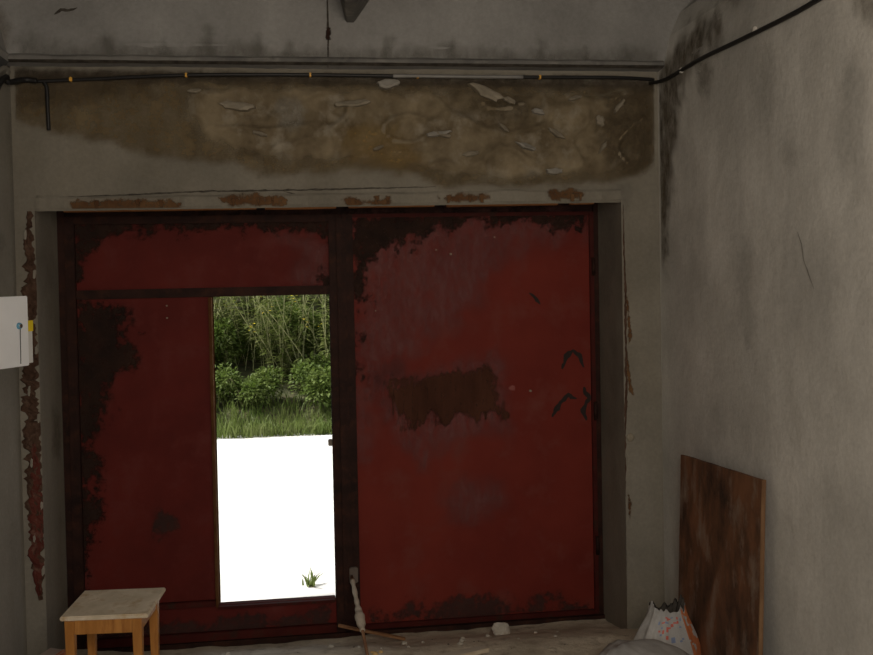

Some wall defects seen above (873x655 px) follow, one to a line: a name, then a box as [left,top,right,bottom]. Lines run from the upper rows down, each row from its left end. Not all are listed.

rust [219,192,288,207]
leakage [16,22,721,253]
flaking render [187,79,651,181]
spalling [20,211,45,601]
rust [344,188,587,465]